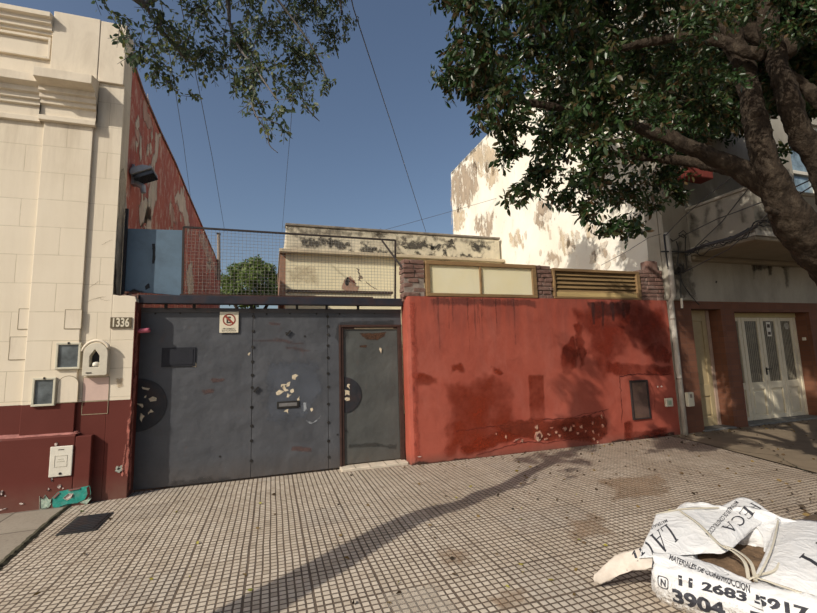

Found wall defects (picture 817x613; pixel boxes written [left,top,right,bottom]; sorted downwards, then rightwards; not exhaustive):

peeling [135,94,161,171]
flaking render [114,169,139,299]
peeling [139,181,157,229]
peeling [169,186,190,232]
peeling [451,145,498,232]
peeling [474,211,494,237]
peeling [509,230,527,248]
peeling [534,195,626,270]
leakage [562,300,671,375]
peeling [115,311,139,490]
leakage [412,369,526,466]
peeling [39,477,91,509]